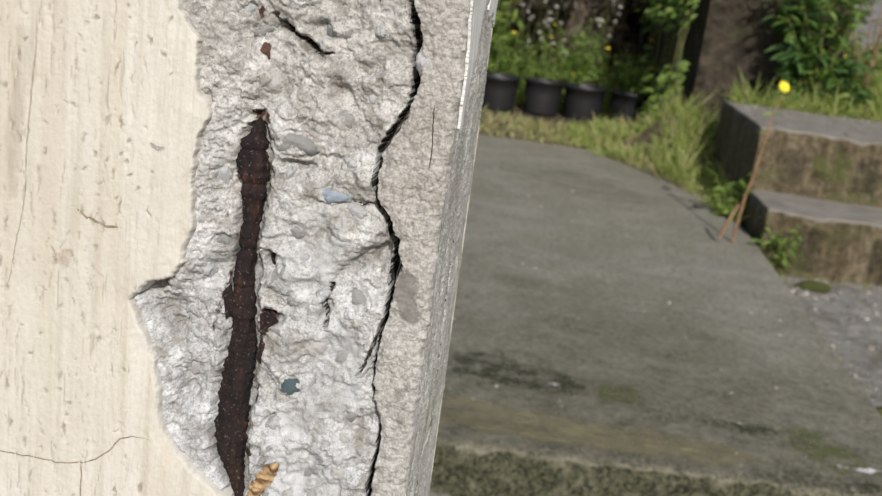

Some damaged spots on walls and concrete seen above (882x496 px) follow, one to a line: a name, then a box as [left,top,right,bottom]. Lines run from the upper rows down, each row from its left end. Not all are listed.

corrosion [260,42,271,60]
corrosion [252,109,271,123]
crack [357,0,435,394]
spalling [134,0,471,496]
corrosion [260,306,279,340]
crack [0,436,145,496]
crack [365,423,382,496]